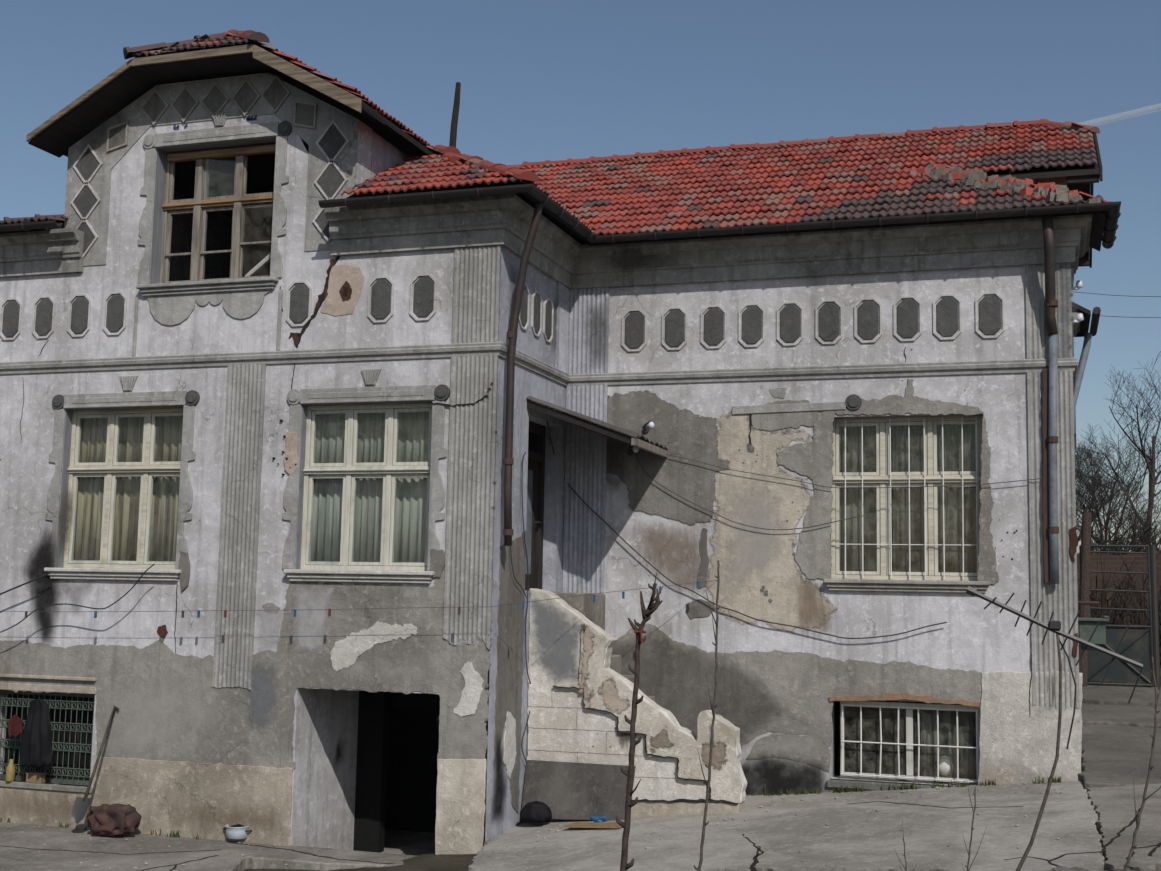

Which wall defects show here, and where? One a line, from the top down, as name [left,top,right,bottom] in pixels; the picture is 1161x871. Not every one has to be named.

spalling [907,163,1112,211]
crack [280,256,340,390]
flaking render [706,413,837,632]
corrosion [1042,369,1050,584]
spalling [330,621,418,672]
spalling [453,661,490,721]
spalling [578,625,630,737]
crack [552,686,738,805]
spalling [650,729,674,753]
spalling [701,741,728,770]